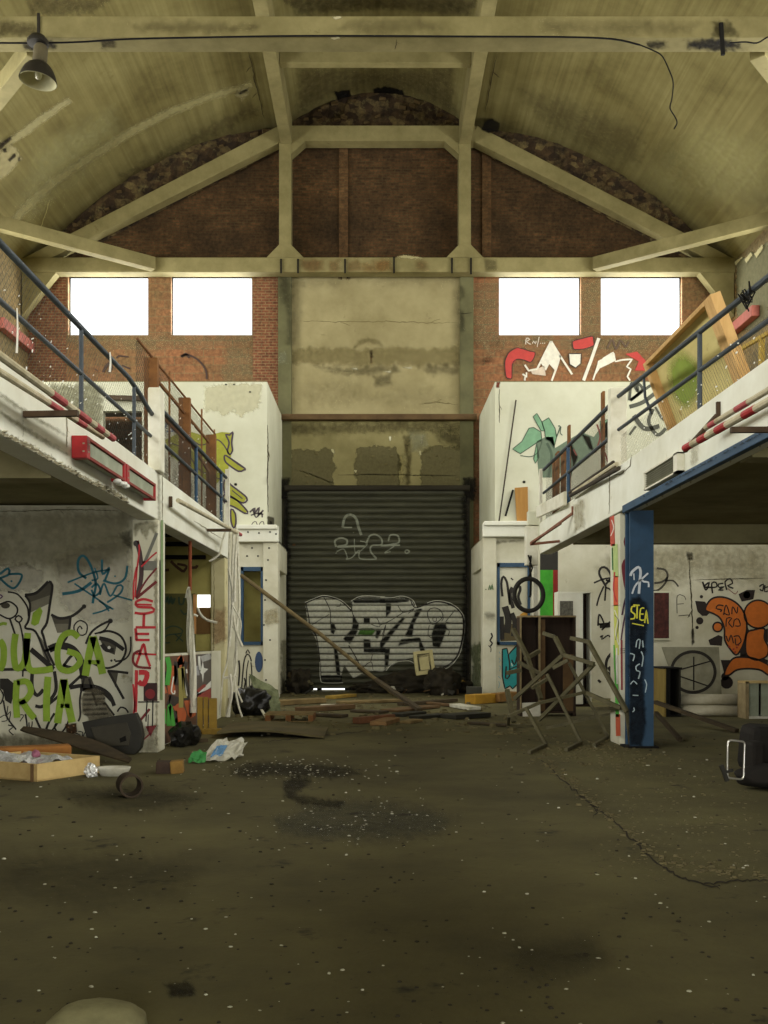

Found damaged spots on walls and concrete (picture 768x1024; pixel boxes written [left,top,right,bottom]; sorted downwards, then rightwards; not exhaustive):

crack [304,312,472,326]
peeling [205,384,261,417]
damp [291,423,460,485]
crack [541,760,767,889]